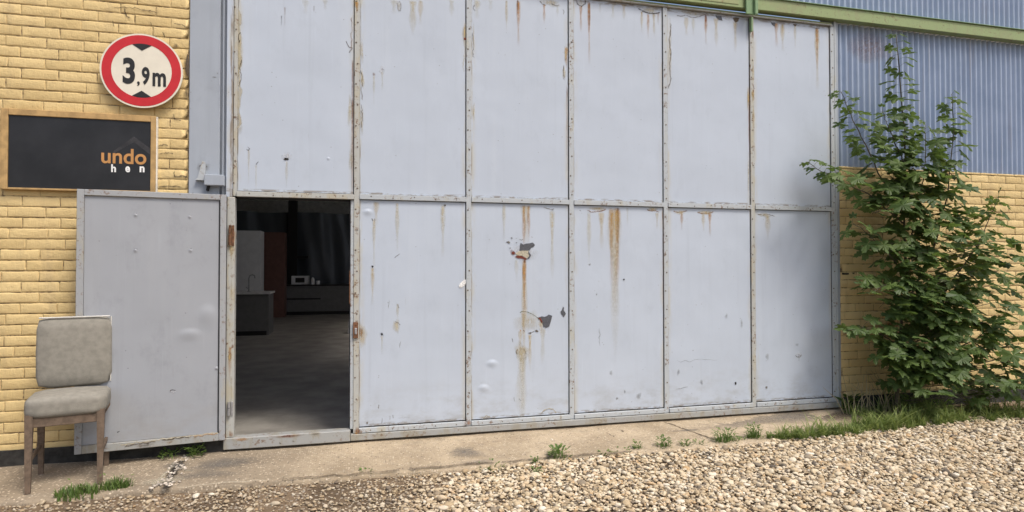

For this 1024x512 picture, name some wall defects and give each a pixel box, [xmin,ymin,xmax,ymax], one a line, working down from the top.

peeling [507,236,535,260]
peeling [538,307,566,328]